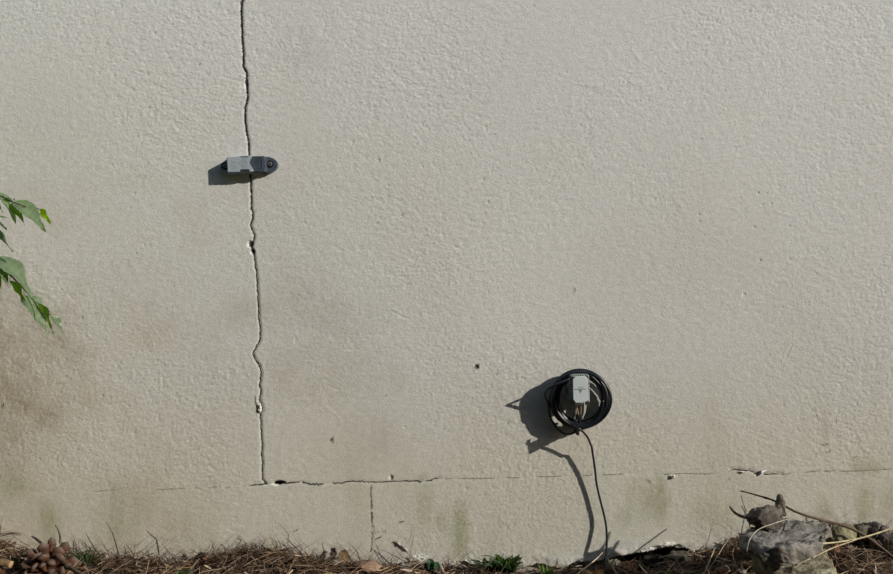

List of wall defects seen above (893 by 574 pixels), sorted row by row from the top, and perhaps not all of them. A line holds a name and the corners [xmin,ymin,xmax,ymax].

crack [159,0,561,557]